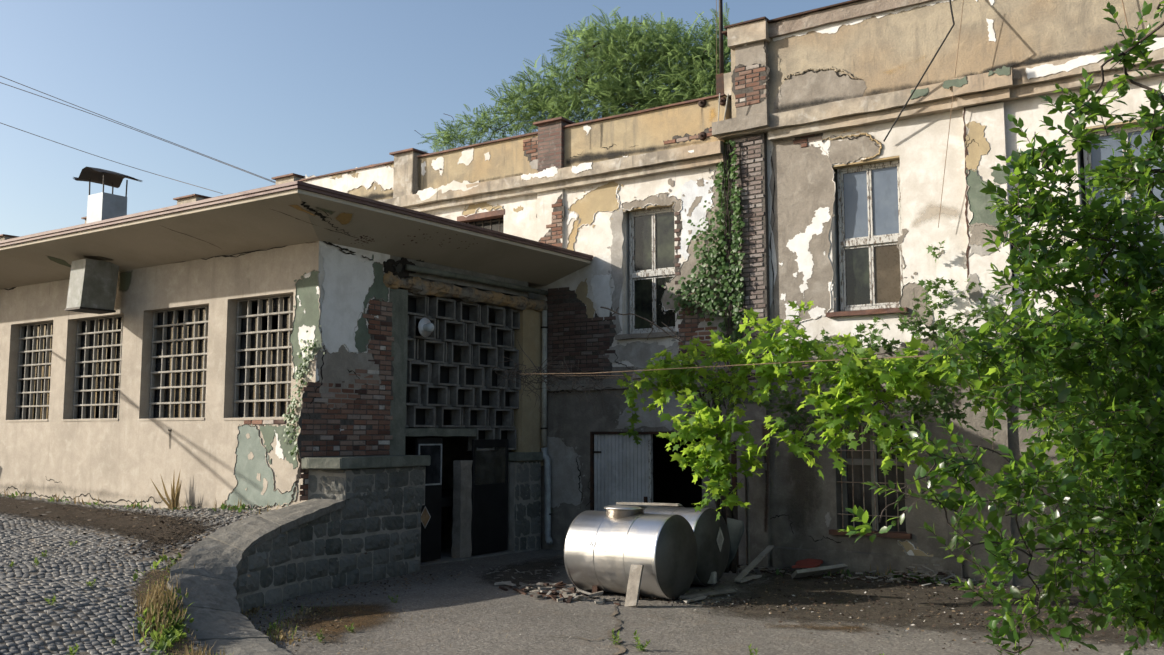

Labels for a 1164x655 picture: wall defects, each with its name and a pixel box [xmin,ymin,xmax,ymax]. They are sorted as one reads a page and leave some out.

peeling [773,0,954,41]
peeling [976,0,996,42]
flaking render [731,63,867,114]
crack [165,202,373,264]
peeling [416,157,480,201]
peeling [458,148,490,165]
flaking render [461,202,523,217]
peeling [521,136,593,180]
flaking render [768,133,883,337]
peeling [965,121,1008,257]
flaking render [539,167,730,432]
flaking render [224,229,478,509]